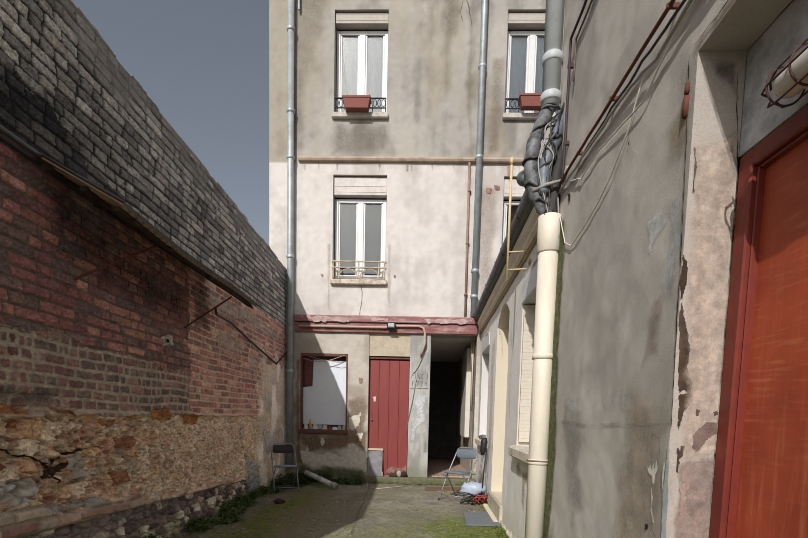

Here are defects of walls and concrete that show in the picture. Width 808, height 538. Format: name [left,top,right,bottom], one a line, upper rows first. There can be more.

peeling [425,319,472,332]
peeling [645,134,737,538]
crack [0,447,87,484]